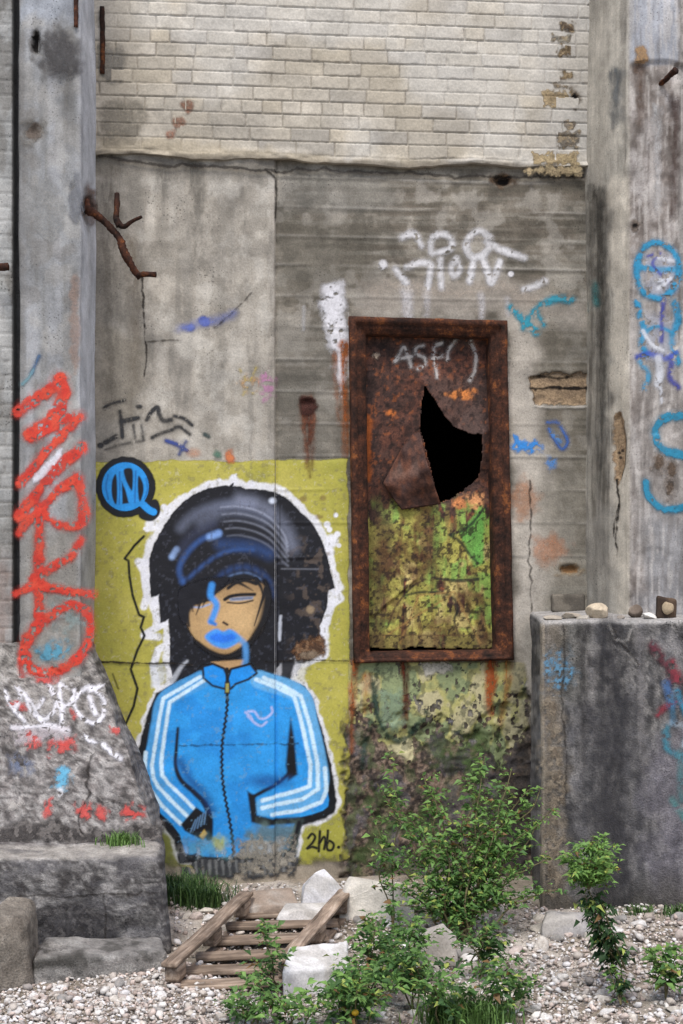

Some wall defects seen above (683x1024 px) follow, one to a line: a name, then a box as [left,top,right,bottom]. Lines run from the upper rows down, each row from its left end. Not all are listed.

leakage [39,30,83,76]
spalling [551,21,575,57]
spalling [489,70,582,188]
crack [141,277,179,376]
spalling [528,372,587,408]
rust [299,396,318,462]
spalling [612,412,626,484]
crack [612,479,620,548]
rust [485,660,508,714]